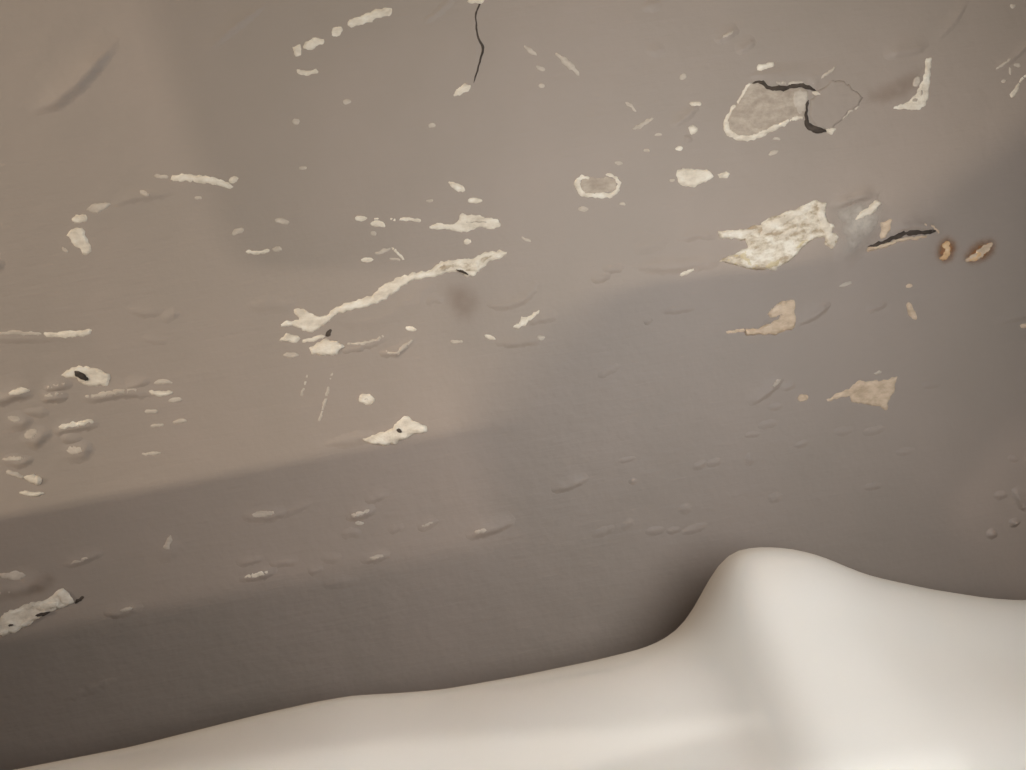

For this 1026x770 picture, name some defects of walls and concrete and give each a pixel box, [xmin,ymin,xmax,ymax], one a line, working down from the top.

crack [454,0,484,96]
peeling [723,56,863,156]
peeling [893,58,932,110]
peeling [355,181,501,245]
peeling [574,161,626,212]
peeling [718,200,838,271]
peeling [866,203,944,252]
peeling [246,249,507,358]
peeling [726,297,831,336]
peeling [827,370,897,410]
peeling [324,416,427,449]
peeling [0,565,84,636]